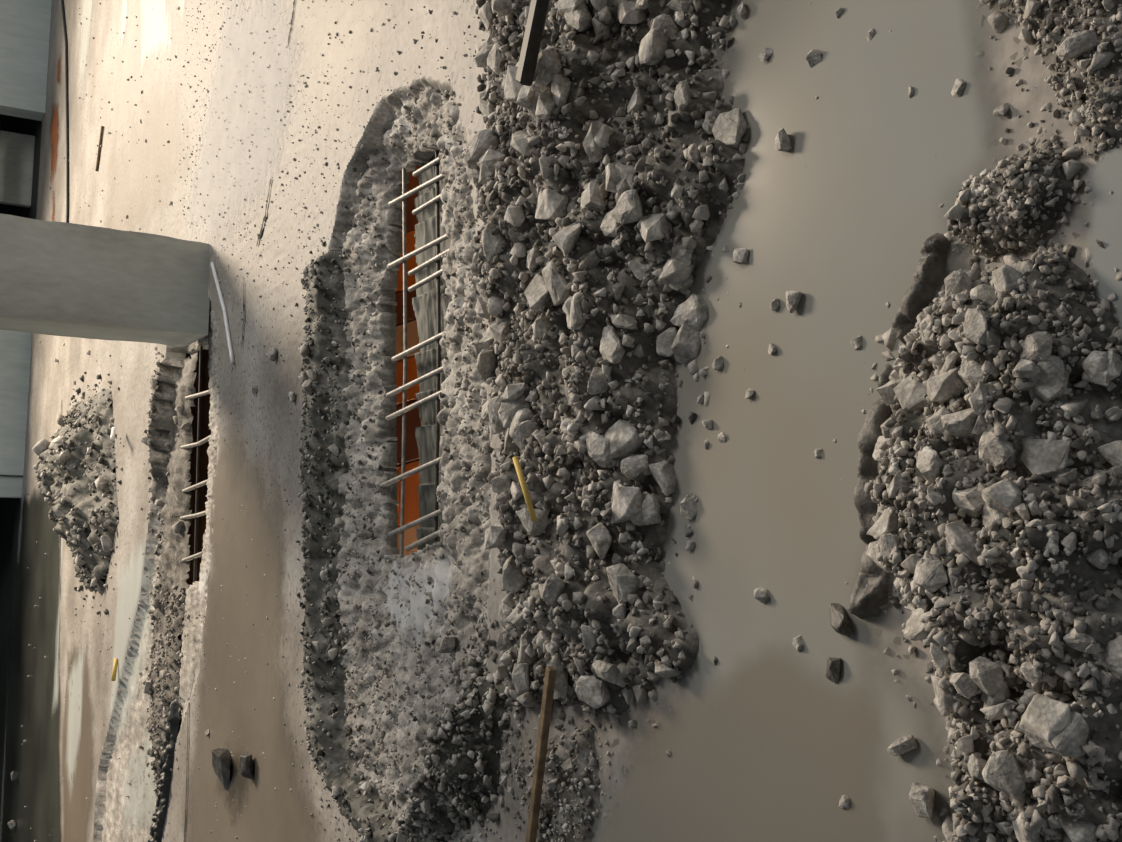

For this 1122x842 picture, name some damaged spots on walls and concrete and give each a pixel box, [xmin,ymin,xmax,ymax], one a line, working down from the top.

rust [50,104,58,179]
spalling [93,495,165,842]
spalling [166,291,220,752]
spalling [327,75,494,828]